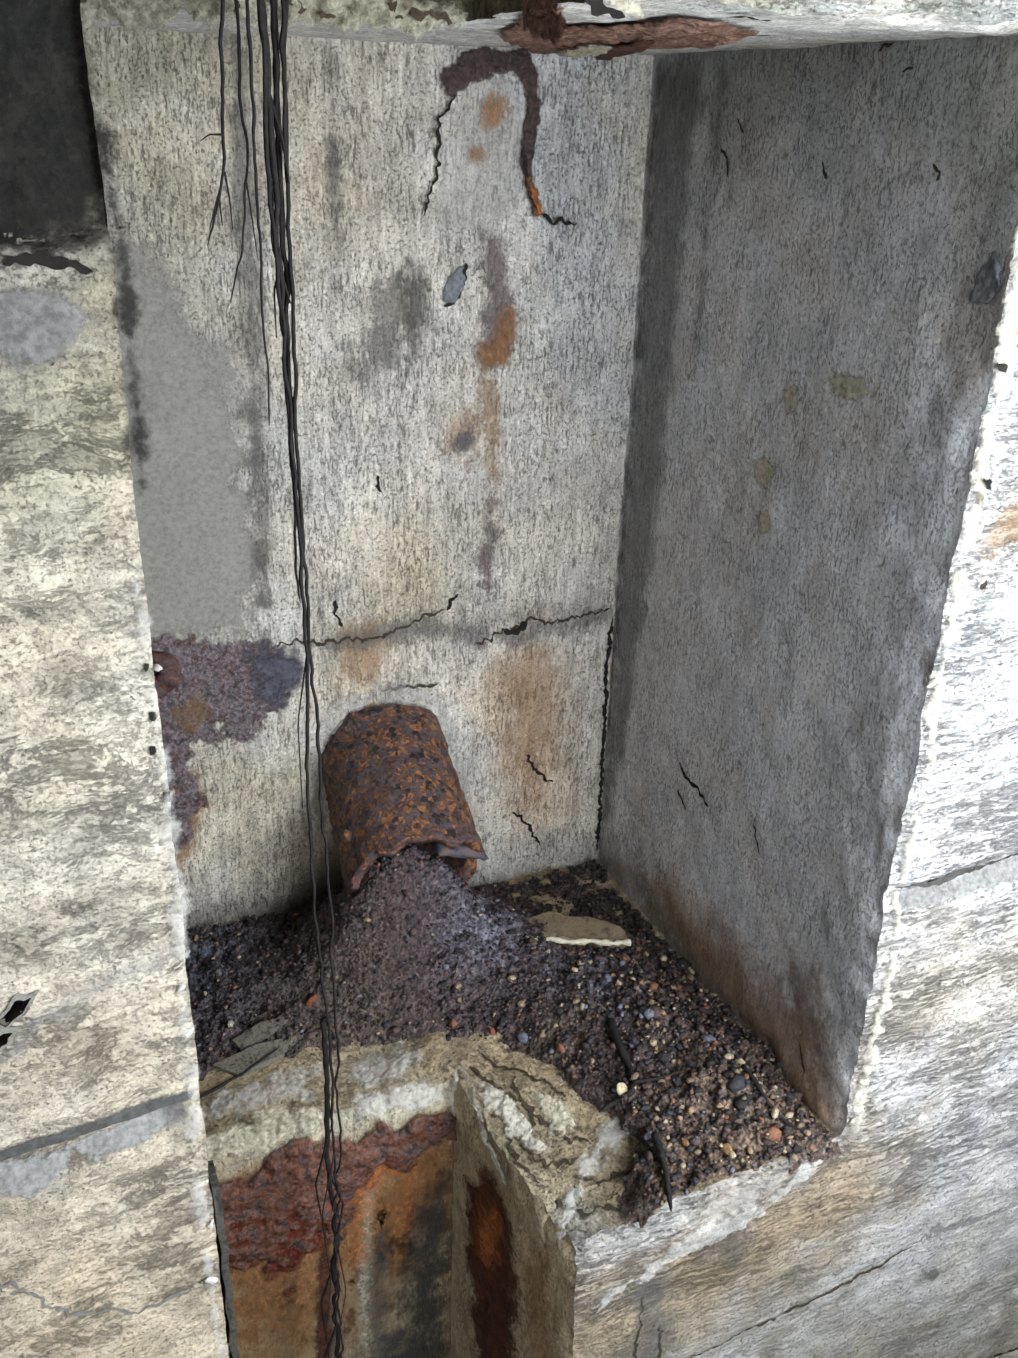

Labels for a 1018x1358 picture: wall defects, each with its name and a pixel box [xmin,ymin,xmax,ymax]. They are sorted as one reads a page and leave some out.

rust [501,0,759,61]
rust [479,240,514,368]
spalling [964,251,1018,550]
crack [277,594,458,647]
crack [375,475,383,493]
rust [478,503,498,588]
crack [475,608,613,851]
spalling [922,571,988,794]
spalling [893,812,920,938]
spalling [848,959,898,1134]
rust [219,1110,521,1358]
crack [633,1202,1018,1358]